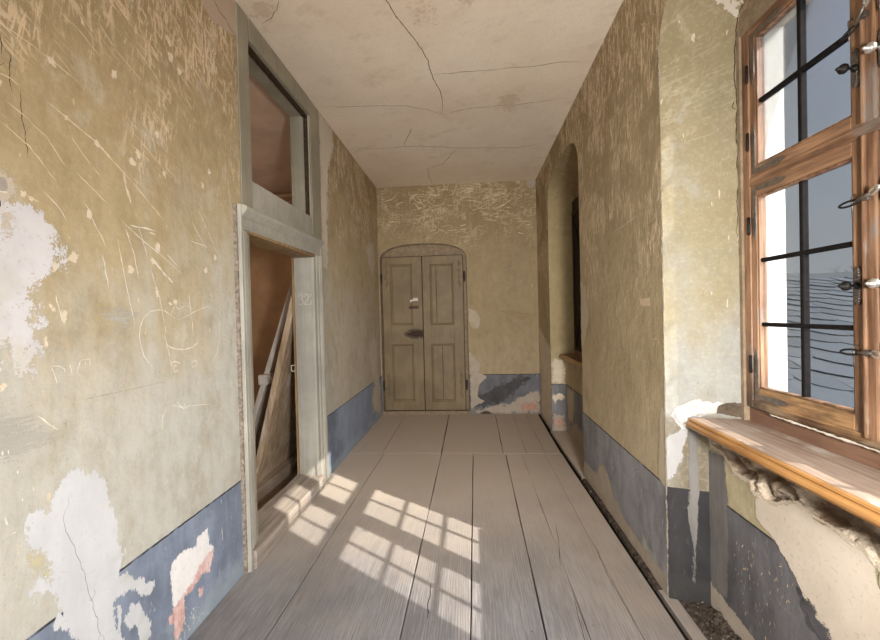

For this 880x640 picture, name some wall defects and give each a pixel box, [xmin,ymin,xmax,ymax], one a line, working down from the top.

crack [0,38,28,153]
crack [365,0,578,182]
water stain [476,391,540,414]
crack [63,495,104,637]
peeling [711,584,755,640]
spalling [708,438,880,572]